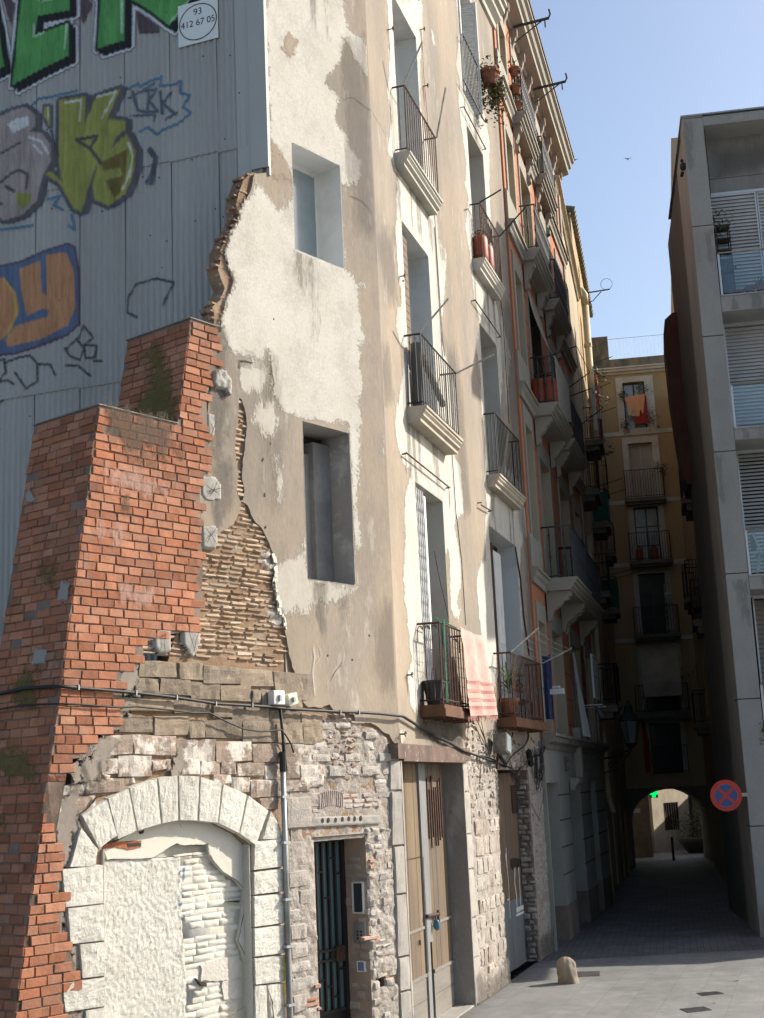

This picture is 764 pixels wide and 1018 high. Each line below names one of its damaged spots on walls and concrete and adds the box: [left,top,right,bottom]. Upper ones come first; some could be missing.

spalling [200,173,253,327]
spalling [143,502,287,667]